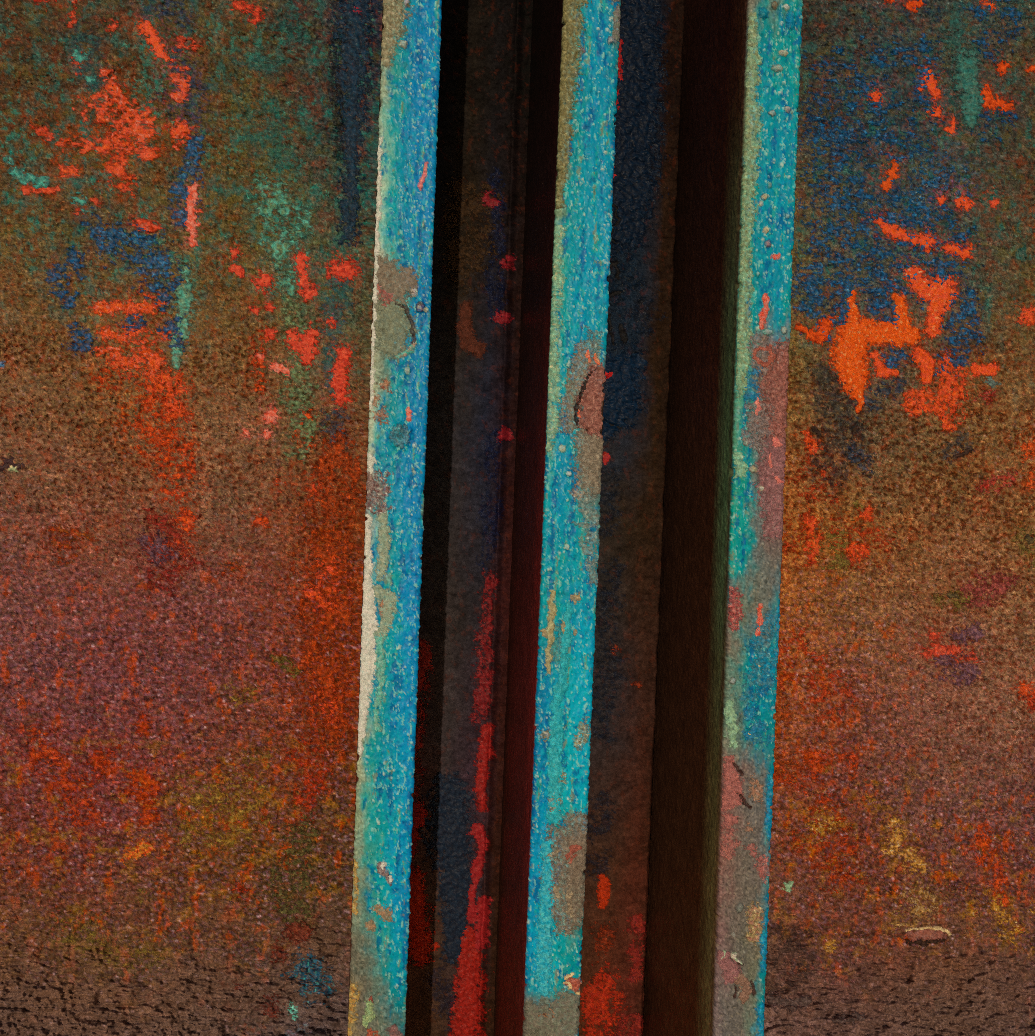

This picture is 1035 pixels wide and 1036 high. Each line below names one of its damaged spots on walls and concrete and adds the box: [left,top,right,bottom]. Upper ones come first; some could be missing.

peeling [228,0,425,464]
peeling [418,162,428,191]
peeling [482,191,501,208]
peeling [490,311,514,324]
peeling [556,0,592,209]
peeling [610,0,672,258]
peeling [539,225,648,825]
peeling [408,570,499,1036]
peeling [523,837,580,1036]
peeling [716,950,765,1036]
peeling [759,908,769,972]
peeling [905,926,952,947]